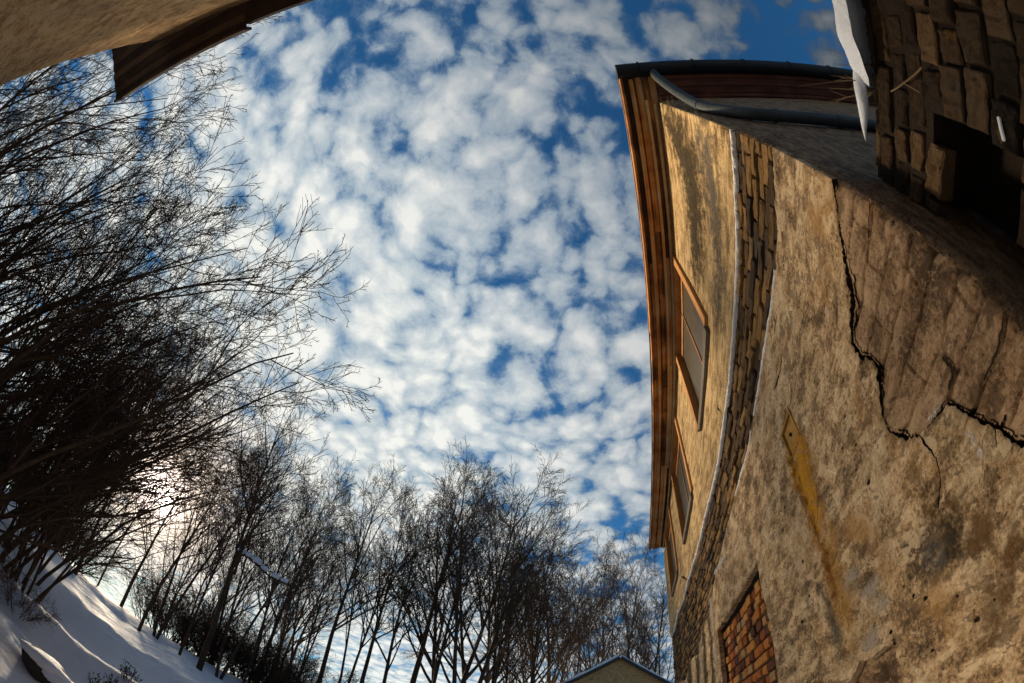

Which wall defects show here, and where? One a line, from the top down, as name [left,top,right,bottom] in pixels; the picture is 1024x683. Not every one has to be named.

crack [832,179,1024,509]
rust [786,433,842,603]